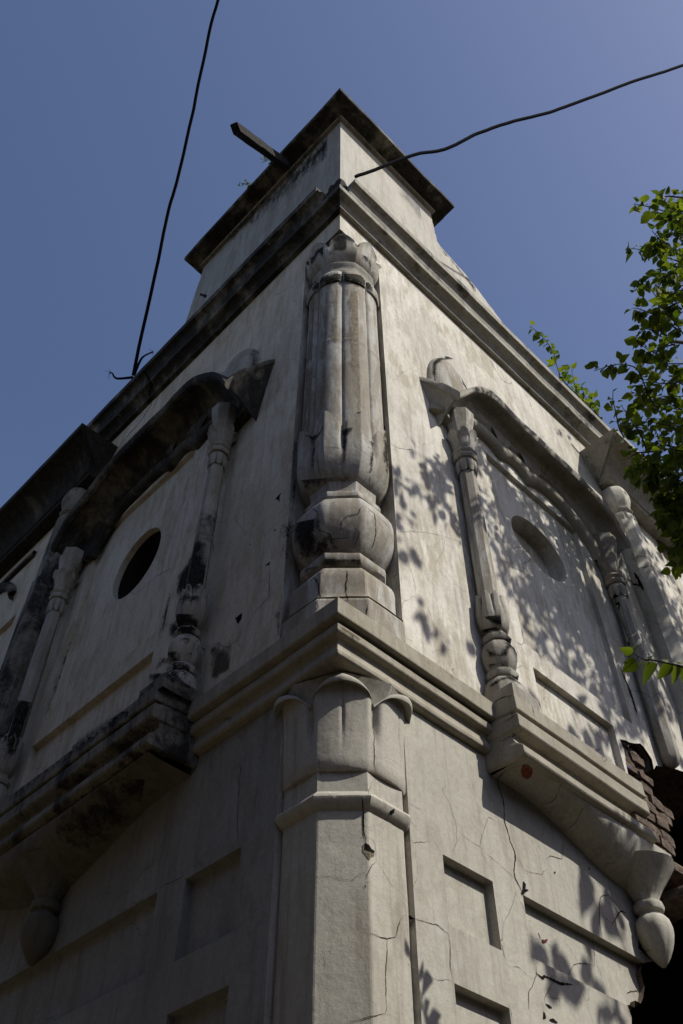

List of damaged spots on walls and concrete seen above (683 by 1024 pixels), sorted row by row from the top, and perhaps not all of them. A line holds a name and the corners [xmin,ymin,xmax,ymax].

mould [162,541,207,636]
crack [312,560,416,613]
spalling [620,740,683,818]
crack [404,762,649,1015]
crack [350,915,452,1022]
spalling [628,962,647,1010]